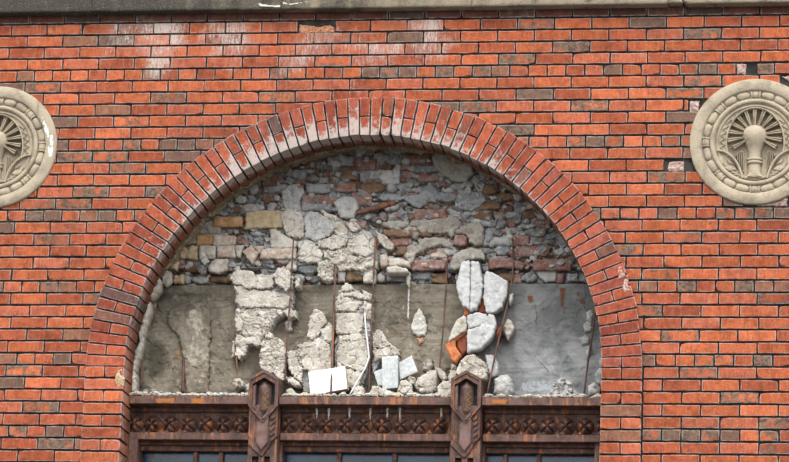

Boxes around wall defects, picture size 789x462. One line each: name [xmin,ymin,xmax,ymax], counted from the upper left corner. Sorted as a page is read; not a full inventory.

leakage [140,23,185,77]
leakage [204,23,246,53]
spalling [299,24,335,34]
leakage [412,20,445,59]
peeling [115,279,164,392]
peeling [167,303,212,394]
spalling [230,208,402,393]
spalling [411,309,428,346]
peeling [449,247,516,355]
spalling [618,267,630,292]